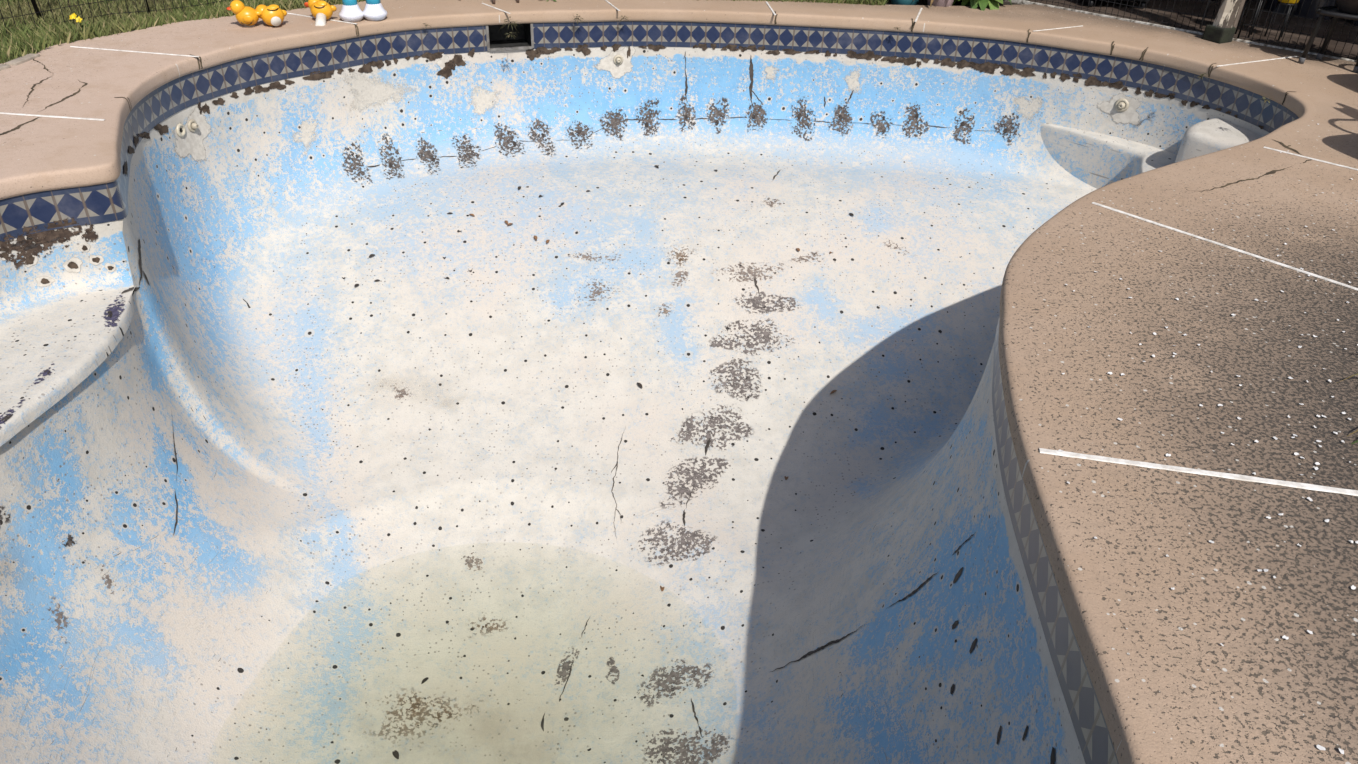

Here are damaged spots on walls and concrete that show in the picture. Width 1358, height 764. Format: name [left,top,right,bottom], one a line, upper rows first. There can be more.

crack [0,59,132,135]
spalling [198,48,475,115]
spalling [526,44,666,61]
crack [594,51,982,133]
spalling [693,43,1238,145]
crack [1188,139,1312,191]
spalling [0,218,116,287]
crack [121,239,150,294]
crack [170,411,178,536]
crack [611,426,626,542]
crack [770,532,976,672]